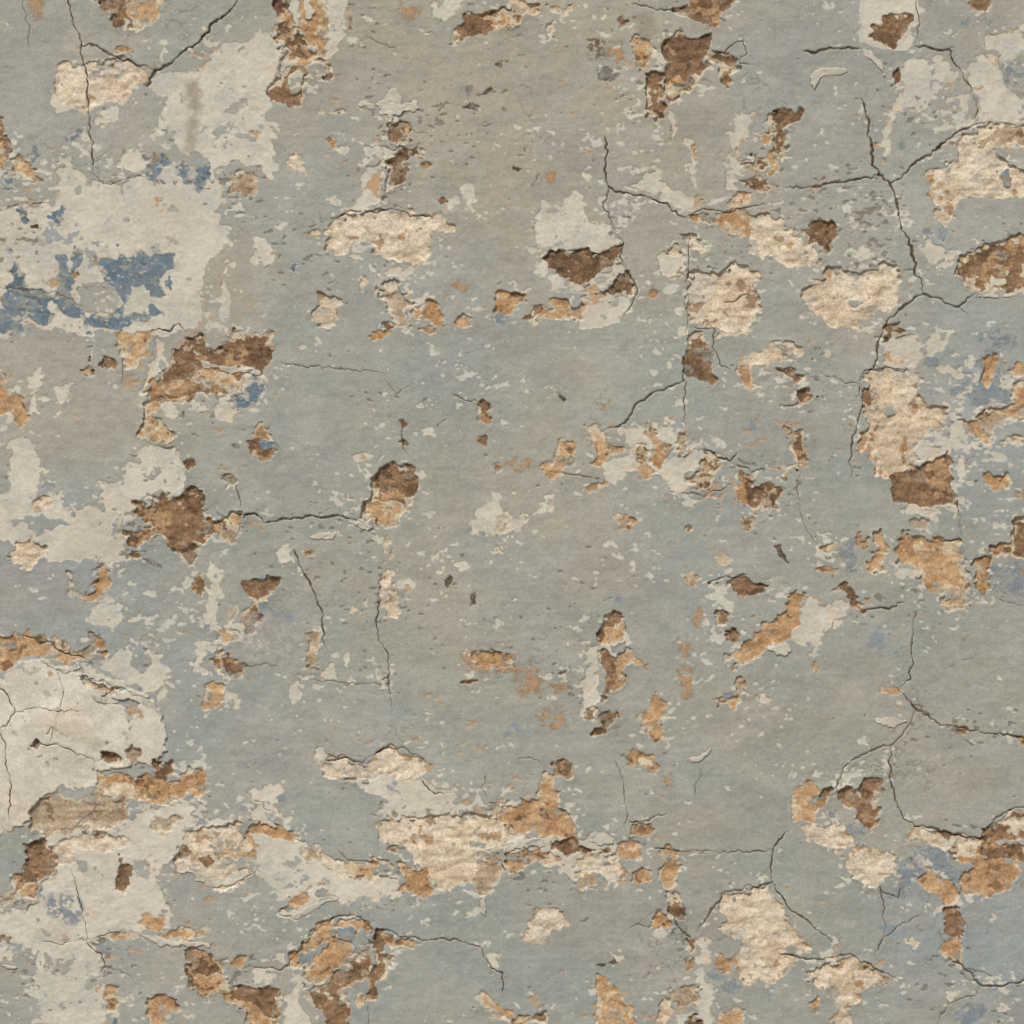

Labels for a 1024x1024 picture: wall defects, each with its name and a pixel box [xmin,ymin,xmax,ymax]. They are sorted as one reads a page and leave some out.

crack [67,0,238,185]
peeling [0,0,356,711]
flaking render [303,88,478,342]
peeling [493,190,635,330]
crack [563,136,729,431]
flaking render [618,0,1024,612]
crack [785,3,984,475]
crack [834,612,1024,839]
peeling [0,741,687,1024]
flaking render [657,886,890,1024]
crack [630,831,921,980]
crack [941,960,1023,1015]